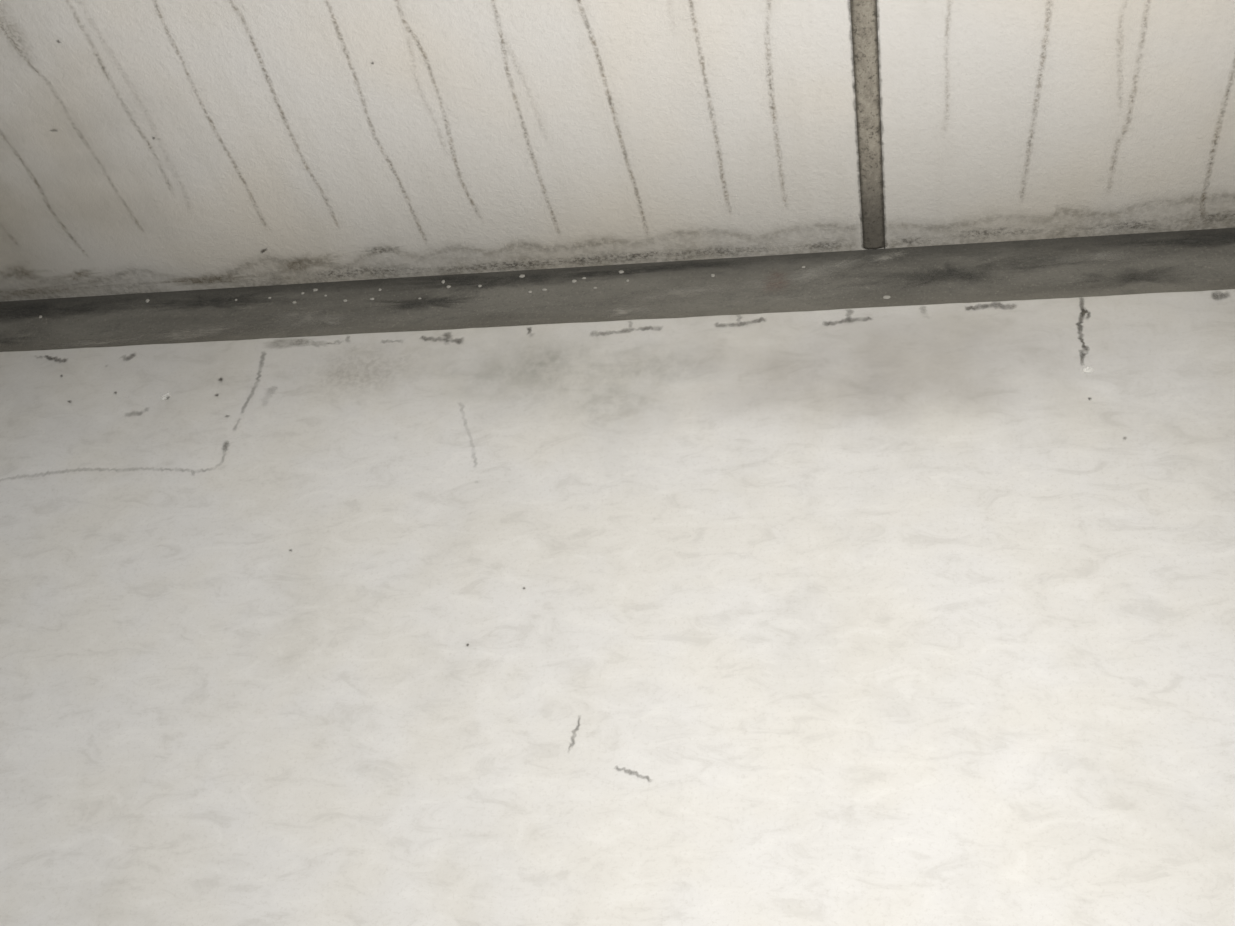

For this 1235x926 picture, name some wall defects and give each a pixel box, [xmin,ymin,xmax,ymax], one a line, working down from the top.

crack [1077,299,1093,373]